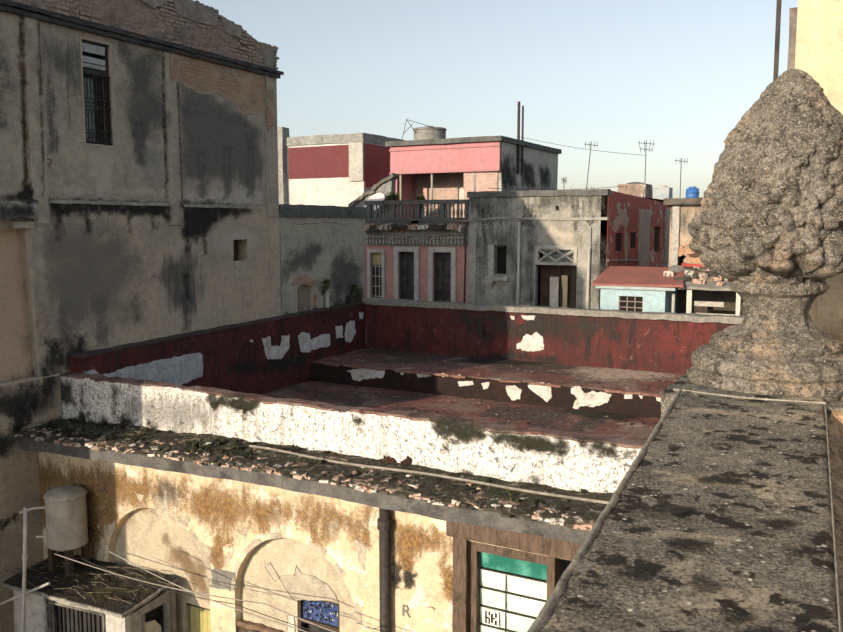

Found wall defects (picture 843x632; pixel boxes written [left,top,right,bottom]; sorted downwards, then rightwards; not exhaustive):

leakage [3,74,26,147]
leakage [38,24,80,163]
flaking render [169,53,275,132]
leakage [118,41,266,325]
leakage [0,148,171,457]
leakage [101,388,217,433]
peeling [250,312,364,360]
peeling [347,368,385,381]
peeling [458,375,490,389]
peeling [506,382,552,402]
peeling [516,332,544,352]
leakage [457,155,678,382]